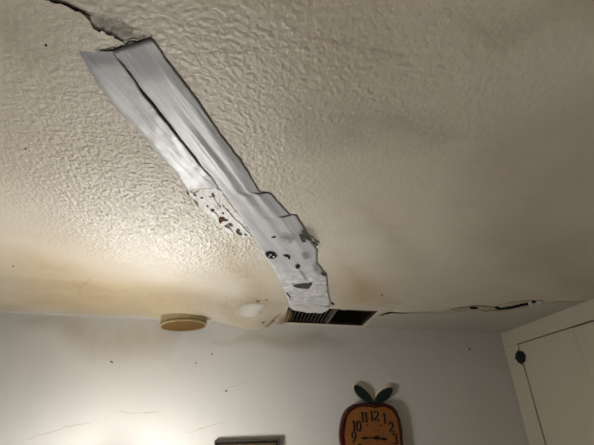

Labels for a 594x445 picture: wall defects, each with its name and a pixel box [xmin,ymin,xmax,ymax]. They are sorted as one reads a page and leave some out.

crack [47,0,152,52]
peeling [186,188,252,237]